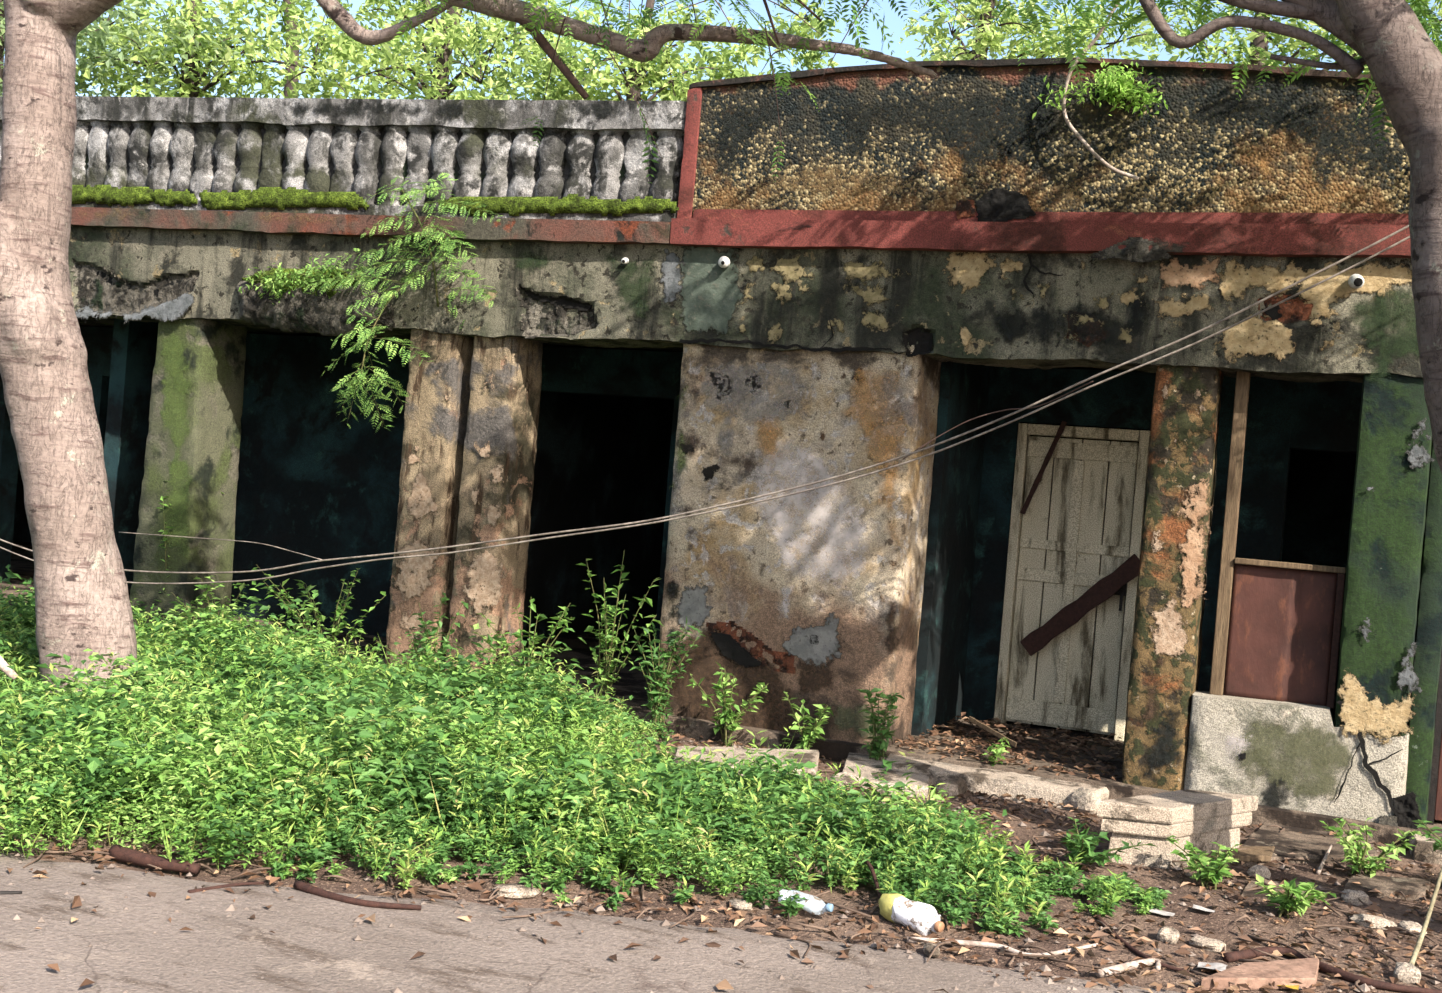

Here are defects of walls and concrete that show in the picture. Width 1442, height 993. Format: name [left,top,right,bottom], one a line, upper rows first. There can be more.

leakage [831,96,1054,188]
leakage [1187,100,1397,189]
spalling [515,285,597,339]
peeling [738,248,815,305]
peeling [1063,237,1412,363]
leakage [163,461,193,553]
peeling [459,546,505,619]
peeling [1149,476,1214,657]
rust [1224,564,1338,706]
spalling [1337,642,1423,746]
mould [1233,712,1352,808]
crack [1334,701,1403,827]